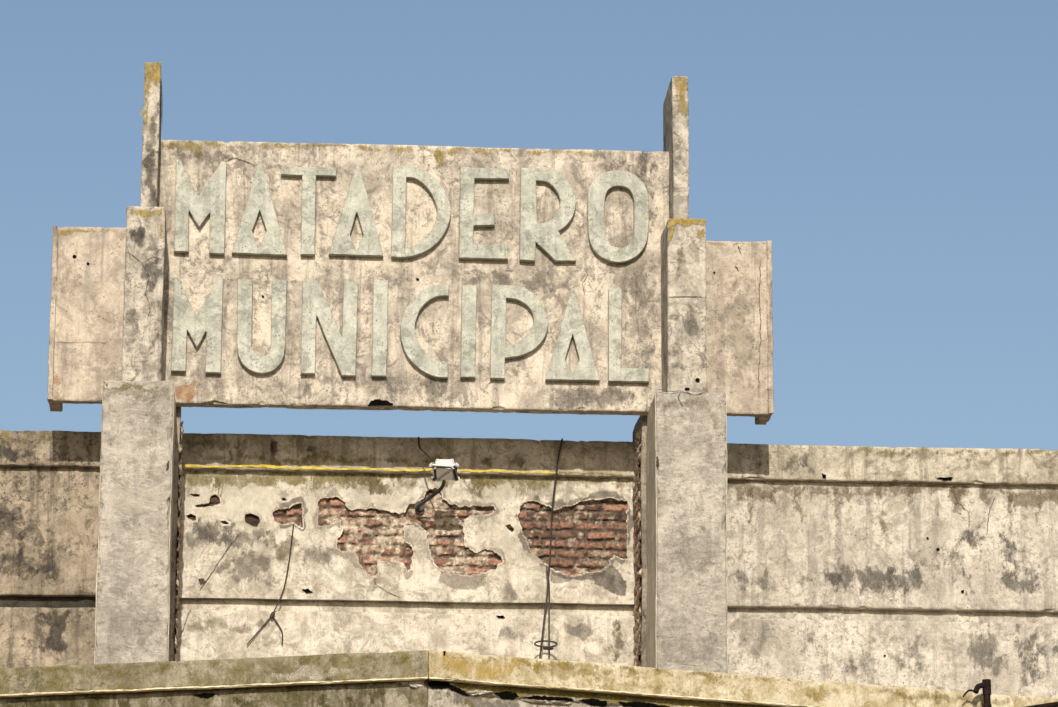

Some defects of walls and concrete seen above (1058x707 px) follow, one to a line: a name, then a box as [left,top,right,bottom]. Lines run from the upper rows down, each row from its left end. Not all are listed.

leakage [0,446,33,462]
leakage [1,533,58,580]
spalling [187,494,220,521]
spalling [245,514,260,527]
spalling [273,488,506,589]
spalling [506,491,635,596]
leakage [802,559,926,594]
leakage [39,609,70,652]
leakage [967,636,1002,676]
leakage [1014,624,1058,686]